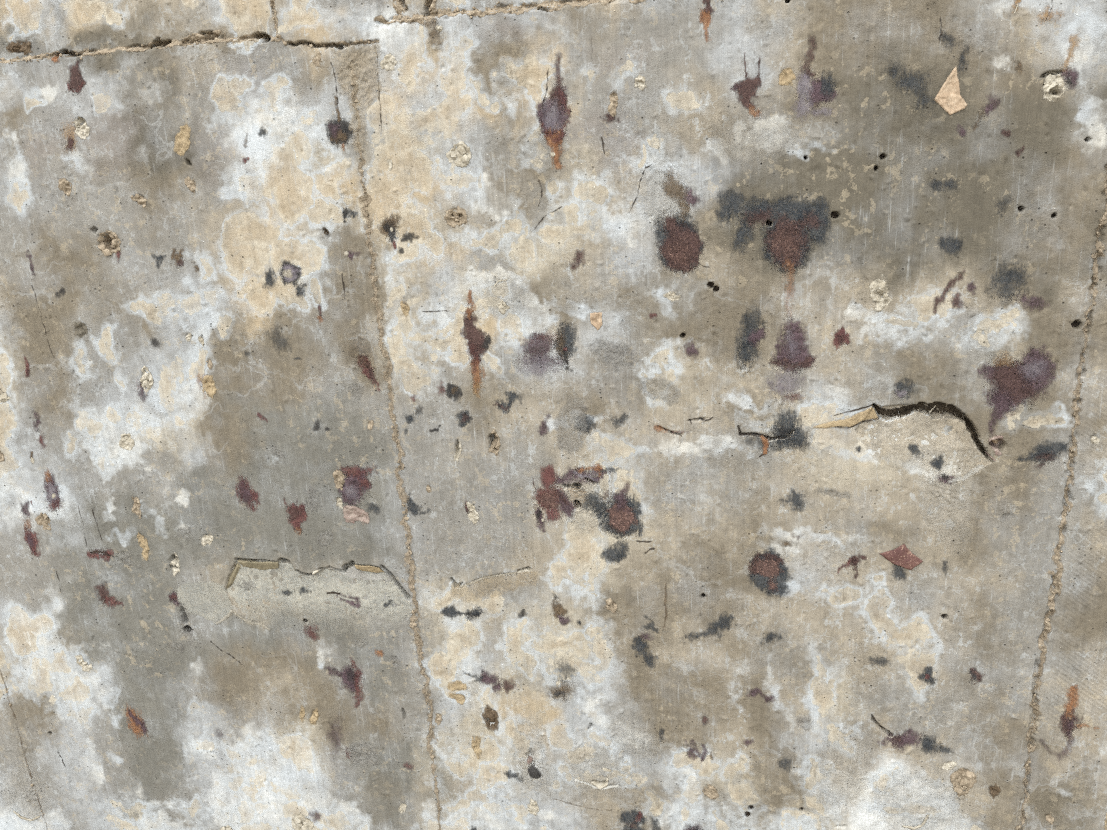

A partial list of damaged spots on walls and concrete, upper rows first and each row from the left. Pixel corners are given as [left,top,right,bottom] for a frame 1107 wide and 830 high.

corrosion [537,56,570,169]
corrosion [733,54,761,116]
spalling [934,67,967,115]
spalling [97,230,121,260]
corrosion [460,290,491,388]
corrosion [978,346,1056,433]
corrosion [338,466,380,512]
corrosion [533,464,617,521]